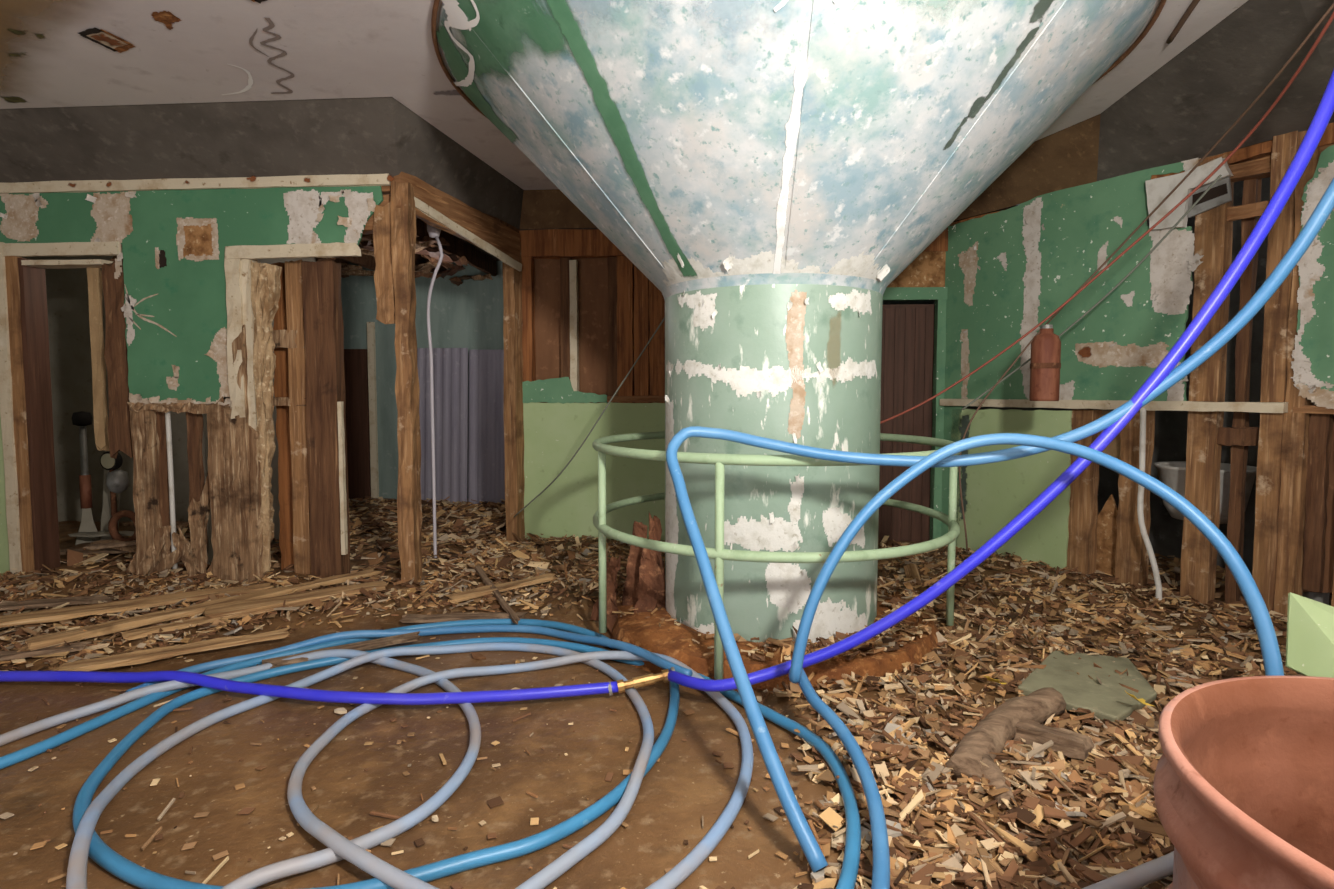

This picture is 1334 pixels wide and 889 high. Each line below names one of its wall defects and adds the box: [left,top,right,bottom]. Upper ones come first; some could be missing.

water stain [0,0,73,103]
peeling [0,193,48,242]
peeling [85,191,137,279]
peeling [283,189,376,244]
peeling [662,250,890,331]
peeling [1020,197,1045,399]
peeling [1121,229,1204,315]
peeling [1291,160,1334,394]
peeling [666,290,877,443]
peeling [1075,341,1189,401]
peeling [665,395,714,634]
peeling [724,475,868,644]